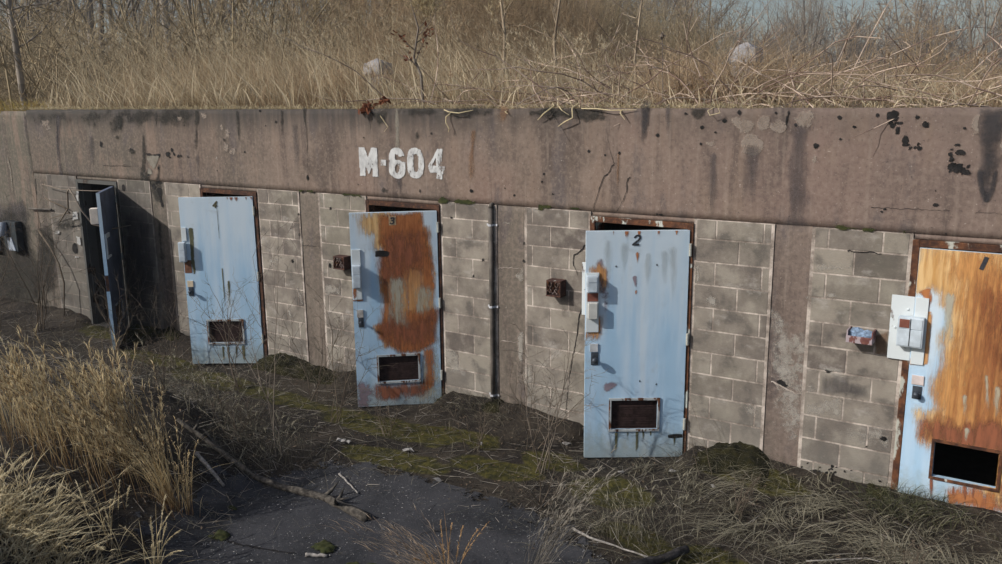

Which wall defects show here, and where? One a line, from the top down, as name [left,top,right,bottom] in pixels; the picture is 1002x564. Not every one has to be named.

leakage [977,111,1002,202]
rust [360,212,439,400]
rust [591,265,606,290]
rust [915,248,1002,510]